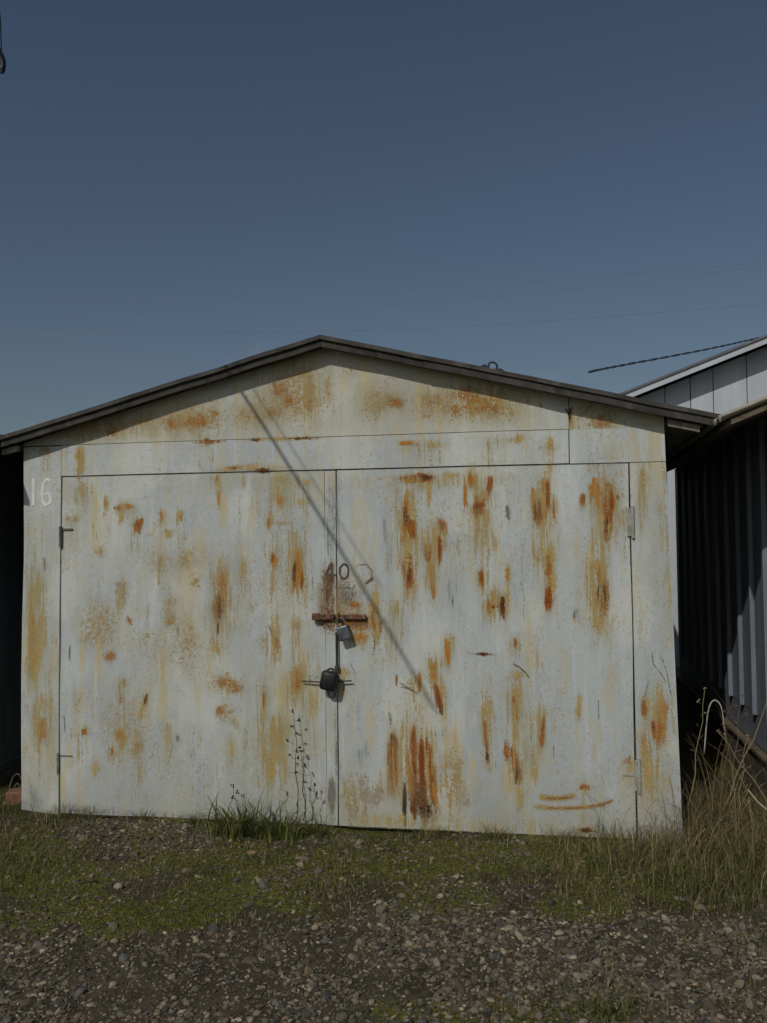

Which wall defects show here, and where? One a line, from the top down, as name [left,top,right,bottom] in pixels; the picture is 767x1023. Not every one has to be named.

corrosion [23,524,53,775]
corrosion [103,496,251,680]
corrosion [195,437,511,792]
corrosion [334,634,498,834]
corrosion [531,437,557,612]
corrosion [481,671,612,812]
corrosion [579,463,626,643]
corrosion [625,682,675,801]
corrosion [638,459,669,554]